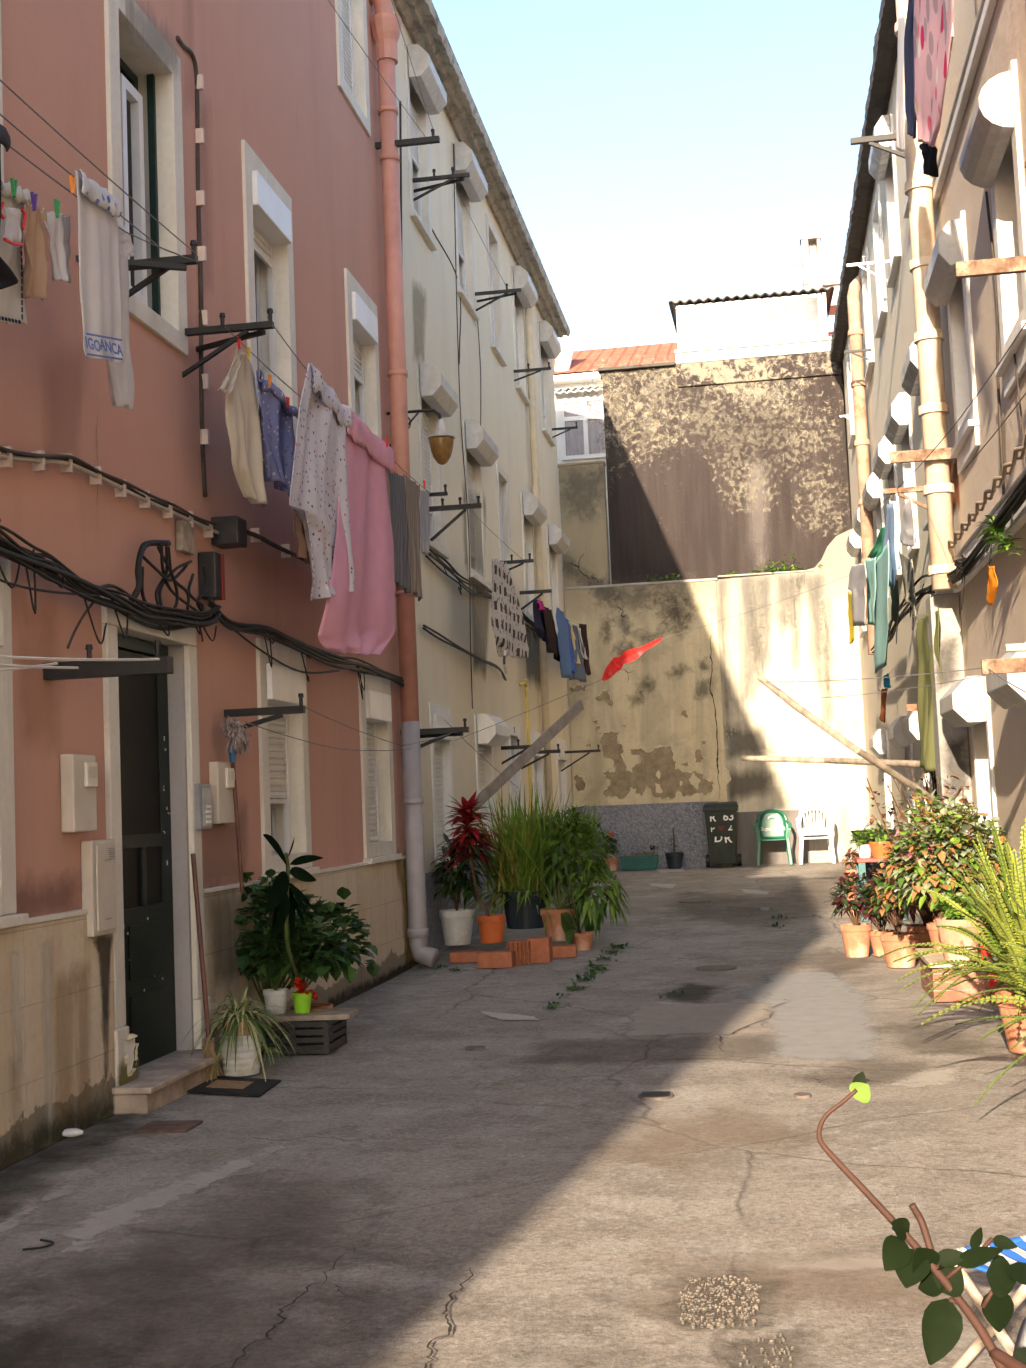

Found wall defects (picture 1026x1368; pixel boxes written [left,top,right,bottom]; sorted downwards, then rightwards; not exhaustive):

peeling [569,684,613,707]
peeling [573,774,586,791]
peeling [585,719,731,801]
leakage [0,947,112,1171]
leakage [95,936,138,1086]
crack [210,1240,364,1368]
crack [424,1268,473,1368]